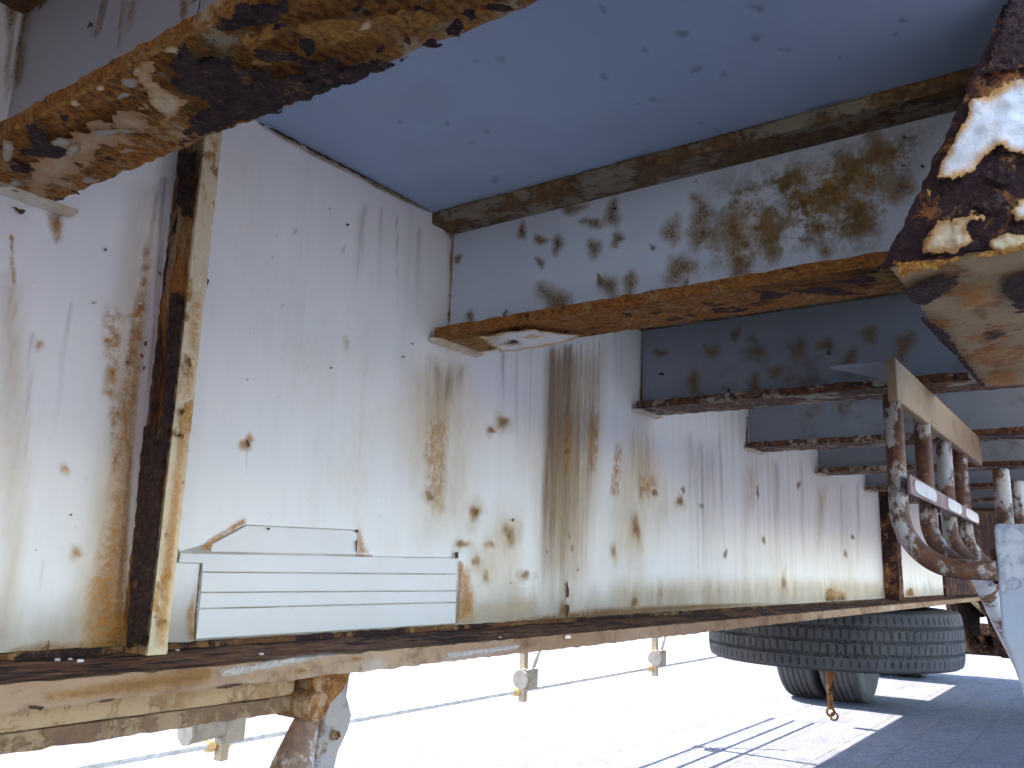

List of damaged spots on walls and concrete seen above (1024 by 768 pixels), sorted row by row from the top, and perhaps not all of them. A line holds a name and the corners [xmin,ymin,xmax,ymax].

rust [238,24,280,66]
rust [293,9,444,45]
peeling [0,60,188,198]
peeling [936,70,1024,180]
rust [564,200,623,255]
rust [663,132,913,277]
peeling [922,210,985,254]
peeling [989,200,1024,251]
rust [598,273,635,298]
rust [896,242,1024,279]
rust [84,251,149,648]
rust [160,407,188,642]